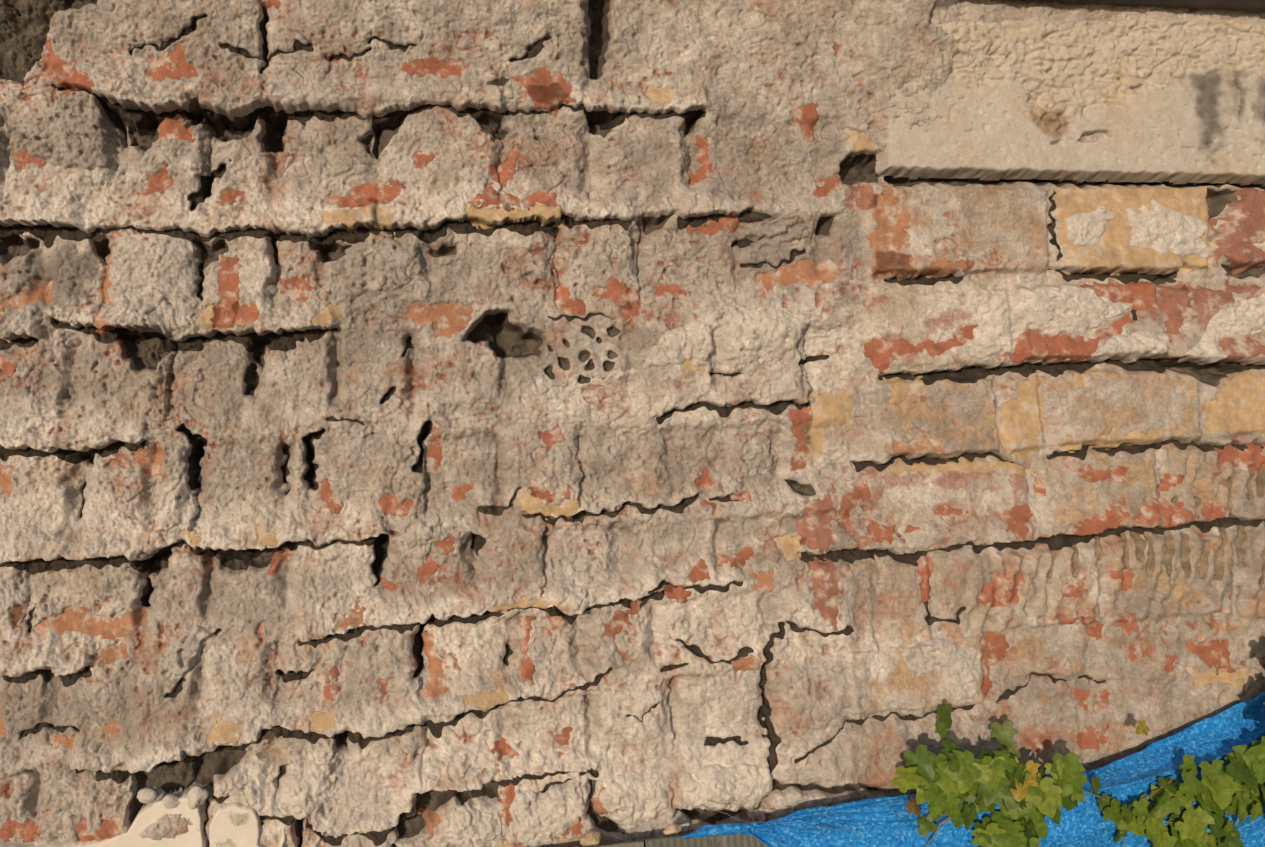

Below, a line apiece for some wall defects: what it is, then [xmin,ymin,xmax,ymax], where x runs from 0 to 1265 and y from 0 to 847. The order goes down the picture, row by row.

leakage [1197,76,1242,146]
crack [187,159,232,211]
spalling [808,175,975,283]
spalling [860,325,978,404]
spalling [890,186,1265,539]
crack [177,424,208,491]
crack [280,386,396,495]
crack [412,420,433,474]
crack [371,534,389,586]
spalling [663,547,775,605]
spalling [774,473,873,631]
crack [626,622,849,773]